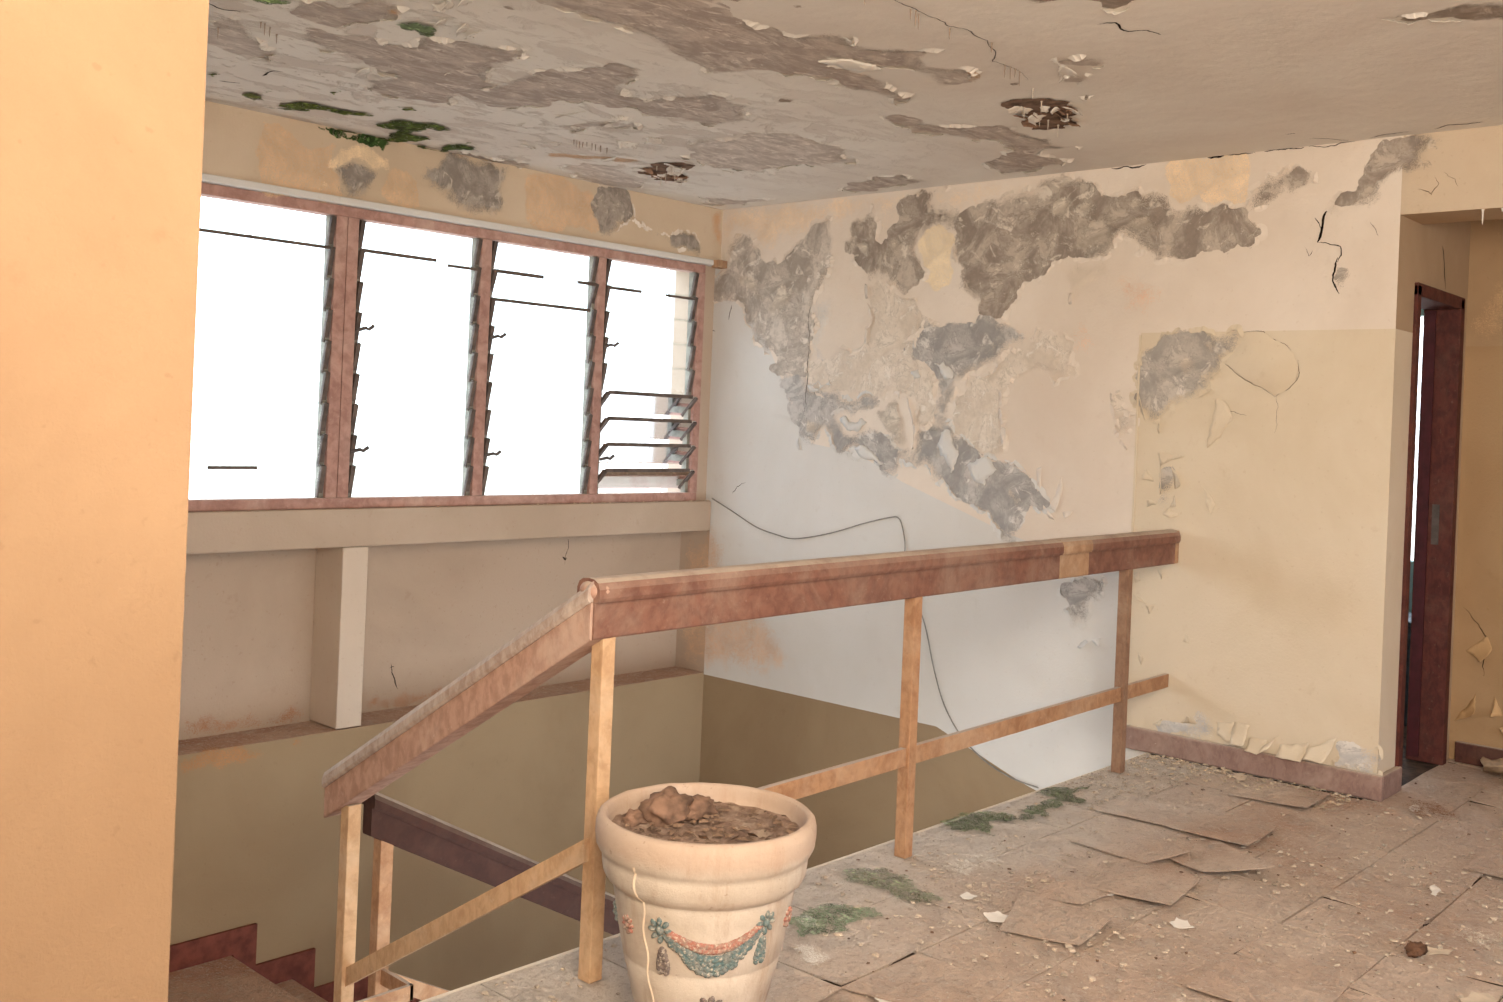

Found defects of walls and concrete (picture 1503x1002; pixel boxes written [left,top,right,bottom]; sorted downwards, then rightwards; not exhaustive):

flaking render [207,15,277,62]
crack [895,0,1028,79]
flaking render [1382,2,1503,25]
flaking render [1326,134,1438,215]
flaking render [290,0,1318,543]
crack [1306,211,1342,293]
crack [1225,331,1300,431]
flaking render [1056,575,1108,649]
peeling [1127,711,1383,776]
peeling [960,892,1008,922]
peeling [1169,917,1194,929]
peeling [1426,946,1453,955]